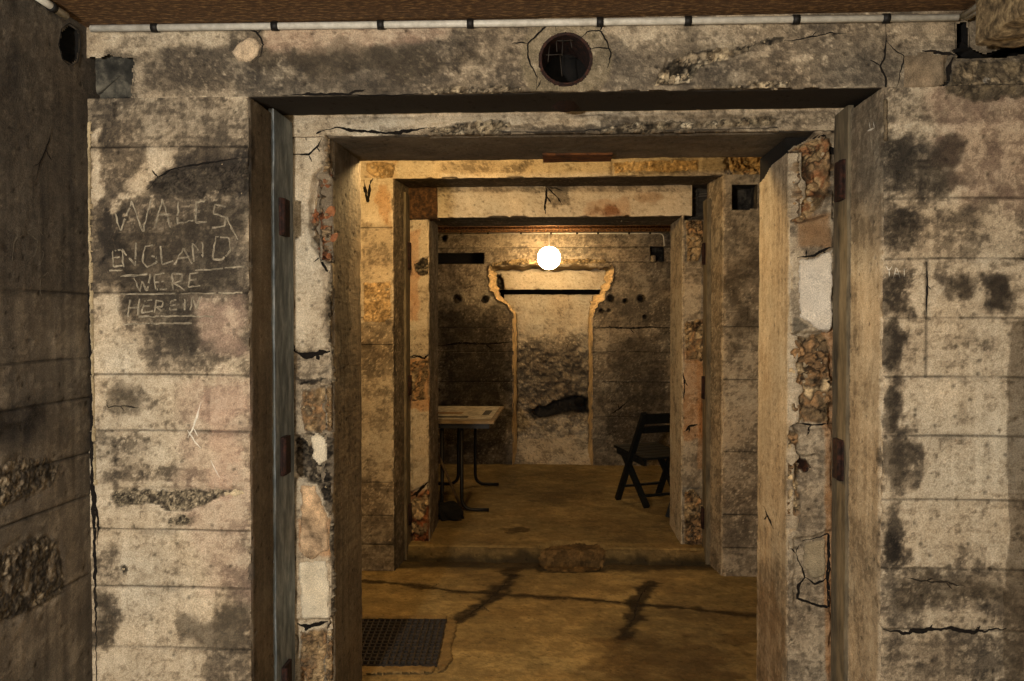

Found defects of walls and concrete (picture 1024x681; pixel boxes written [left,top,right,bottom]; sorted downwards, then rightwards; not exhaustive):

crack [512,26,556,89]
spalling [654,37,784,86]
crack [870,24,956,87]
crack [293,127,435,162]
spalling [727,136,834,225]
spalling [488,258,614,465]
crack [87,247,138,681]
spalling [784,334,832,524]
spalling [110,487,244,526]
spalling [0,534,64,621]
crack [791,533,831,608]
crack [883,624,1006,635]